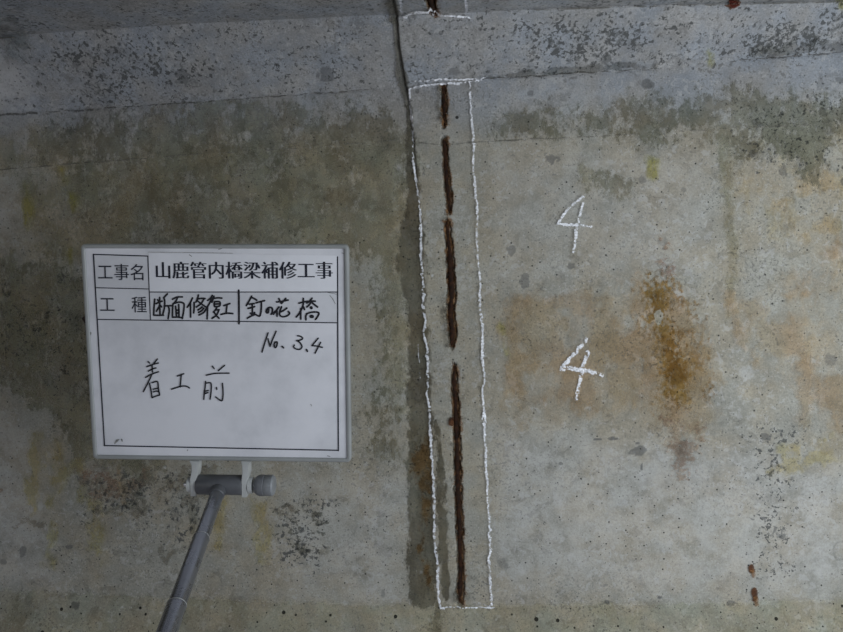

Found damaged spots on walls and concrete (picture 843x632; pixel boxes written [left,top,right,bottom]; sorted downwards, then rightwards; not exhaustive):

crack [0,89,375,116]
spalling [424,0,439,18]
leakage [19,99,412,365]
leakage [0,249,157,520]
leakage [178,82,843,632]
rust [499,237,715,481]
leakage [0,589,169,632]
rust [748,564,759,606]